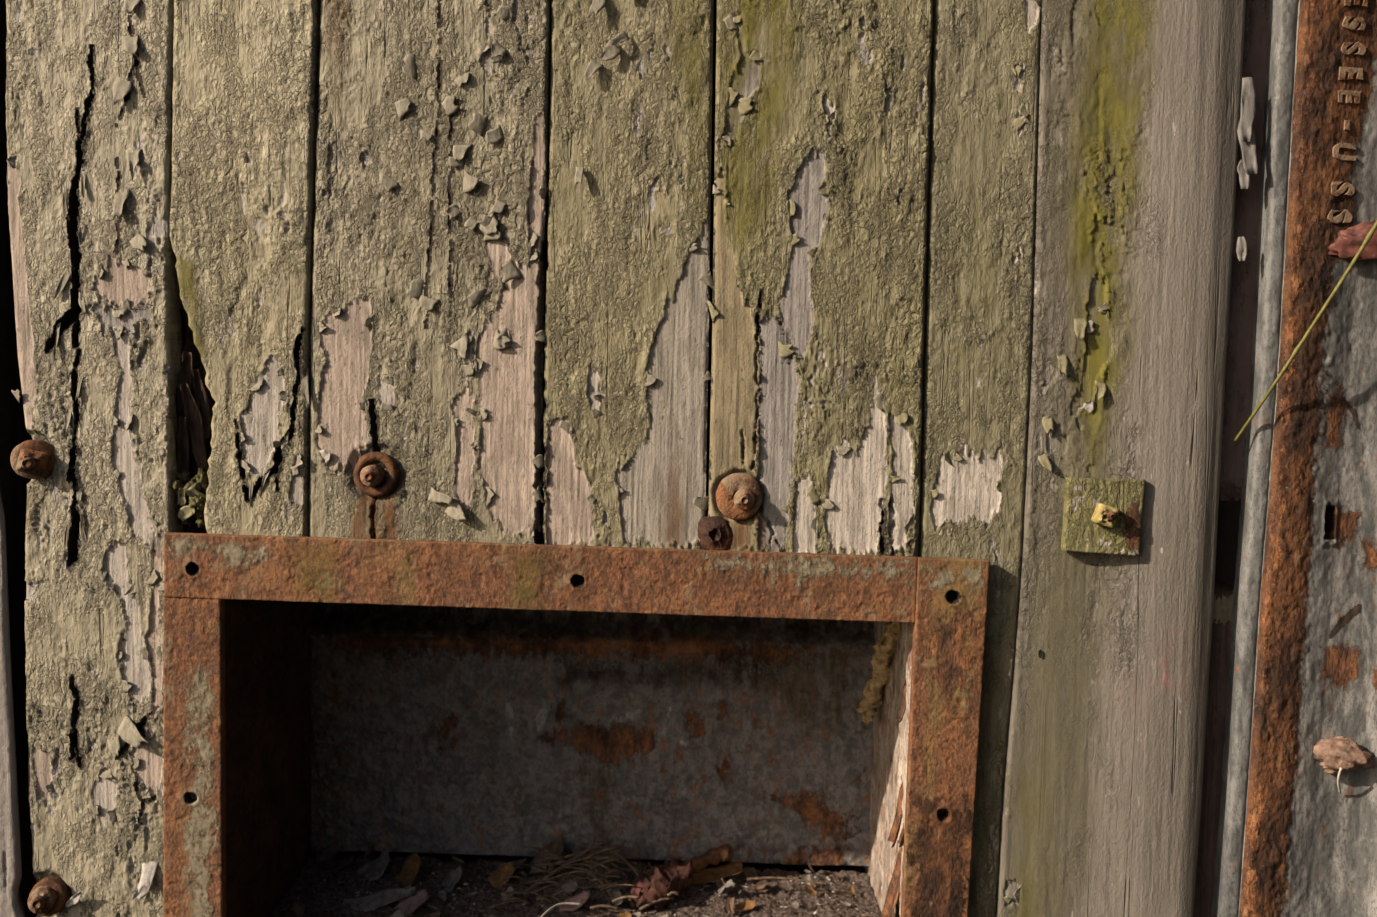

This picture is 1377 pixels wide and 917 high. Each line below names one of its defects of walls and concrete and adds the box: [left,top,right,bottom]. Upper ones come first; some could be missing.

crack [44,11,146,570]
peeling [88,233,165,832]
peeling [240,351,288,478]
peeling [290,296,397,507]
peeling [428,37,597,546]
peeling [614,96,1003,555]
water stain [1068,242,1100,376]
rust [1239,0,1377,917]
crack [67,674,160,831]
rust [763,785,861,866]
rust [881,781,974,917]
rust [896,603,984,722]